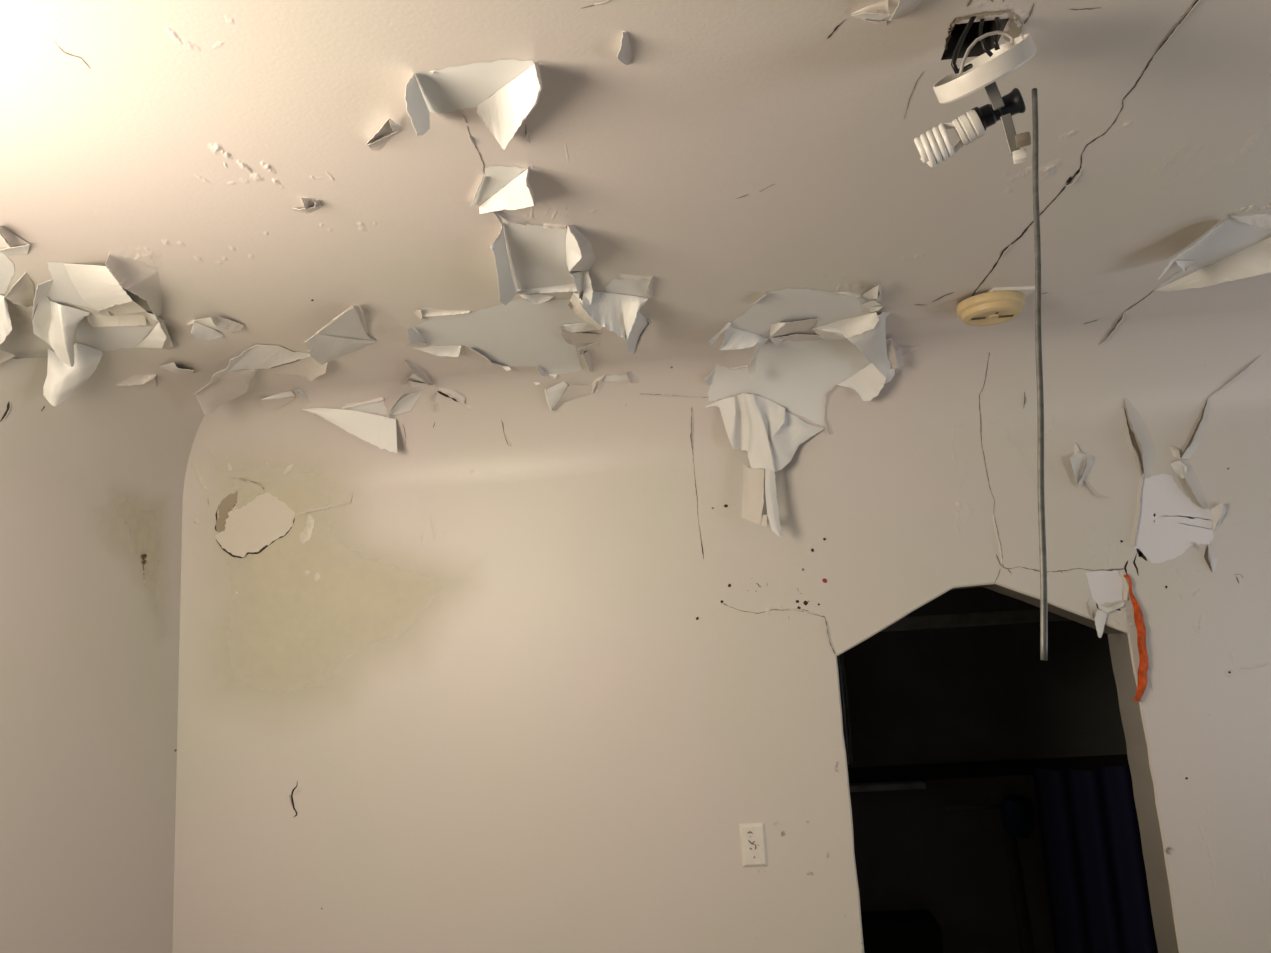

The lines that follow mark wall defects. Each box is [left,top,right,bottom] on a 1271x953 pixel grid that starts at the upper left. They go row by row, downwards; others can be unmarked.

peeling [366,59,542,151]
crack [916,0,1201,306]
peeling [0,225,194,406]
peeling [186,166,653,453]
peeling [1155,214,1271,292]
spalling [215,492,238,532]
peeling [704,283,922,537]
crack [979,352,1124,582]
peeling [1120,356,1261,572]
crack [729,606,837,655]
peeling [1085,570,1129,638]